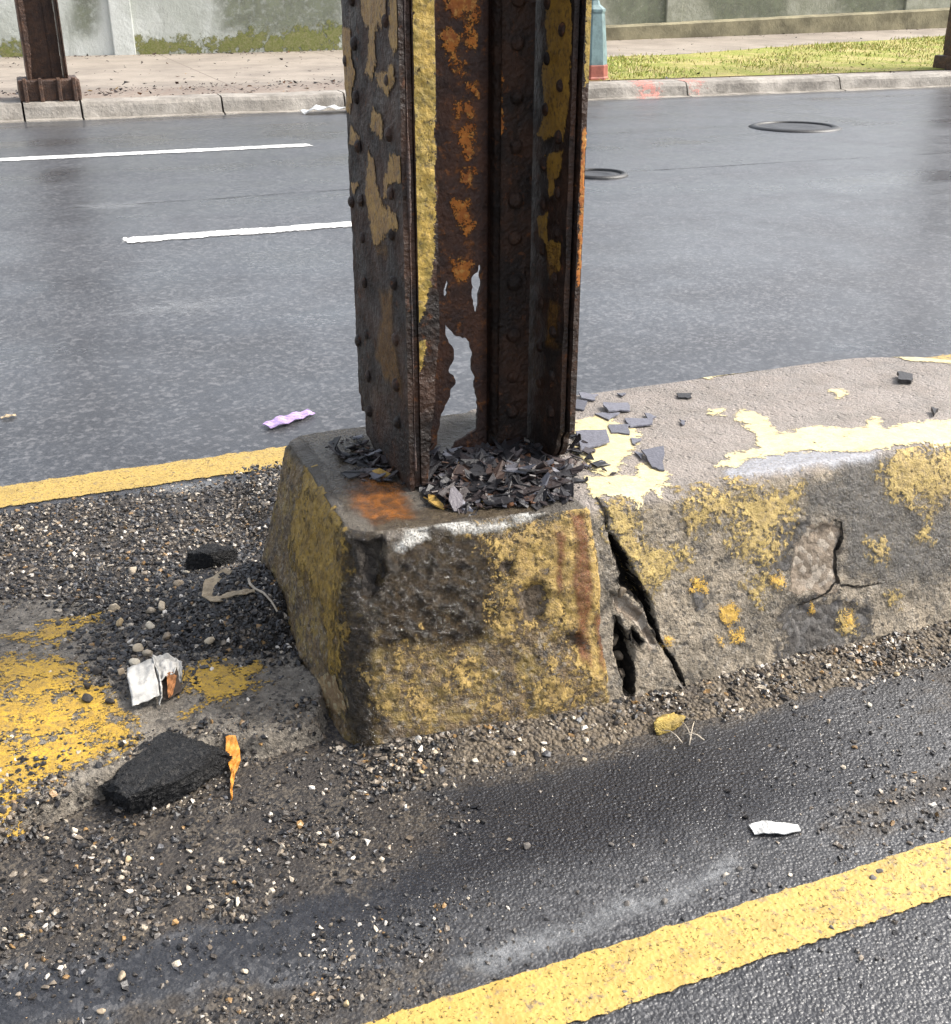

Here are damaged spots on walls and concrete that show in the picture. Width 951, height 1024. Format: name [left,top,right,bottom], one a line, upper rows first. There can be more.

peeling [413,0,437,322]
corrosion [438,0,482,237]
corrosion [449,257,475,282]
corrosion [575,127,587,287]
peeling [419,340,427,372]
peeling [827,388,849,399]
corrosion [353,479,412,520]
corrosion [557,514,604,666]
peeling [287,407,951,735]
crack [595,496,686,694]
crack [797,519,881,605]